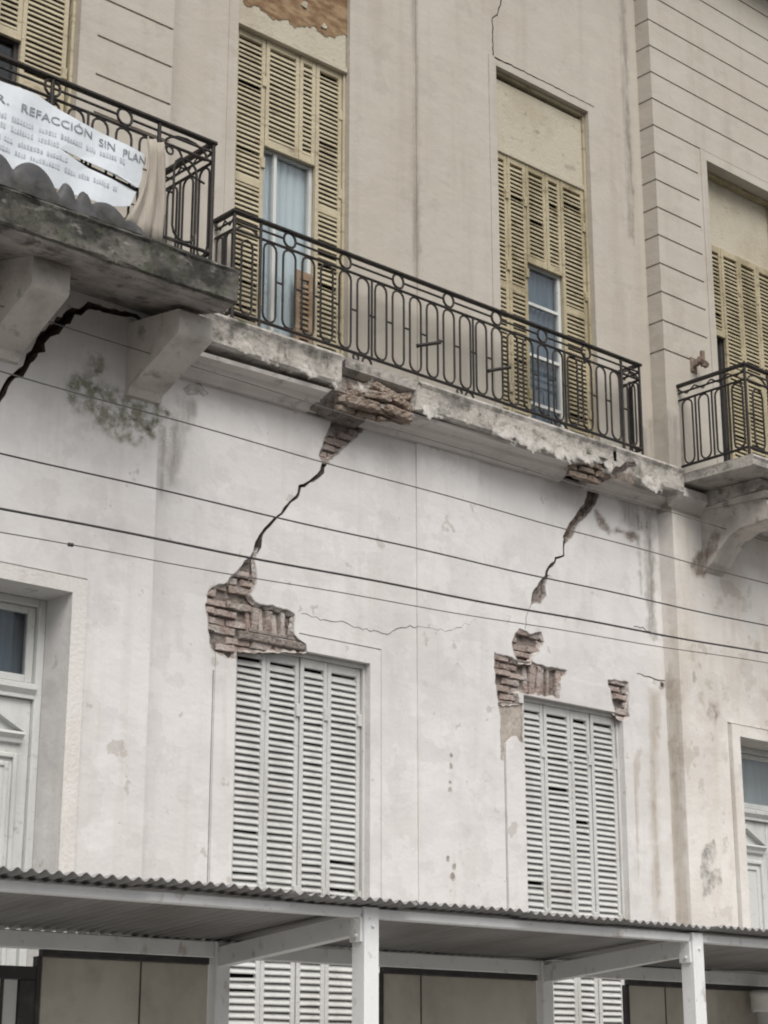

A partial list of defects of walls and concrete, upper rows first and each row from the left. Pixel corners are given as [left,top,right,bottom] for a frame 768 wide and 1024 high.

peeling [243,0,347,38]
crack [492,0,594,107]
crack [0,302,142,402]
crack [252,464,327,553]
flaking render [319,421,364,464]
peeling [423,405,443,419]
peeling [492,423,615,472]
peeling [641,473,662,493]
flaking render [205,547,307,659]
crack [525,491,599,628]
flaking render [494,628,567,760]
flaking render [608,679,629,721]